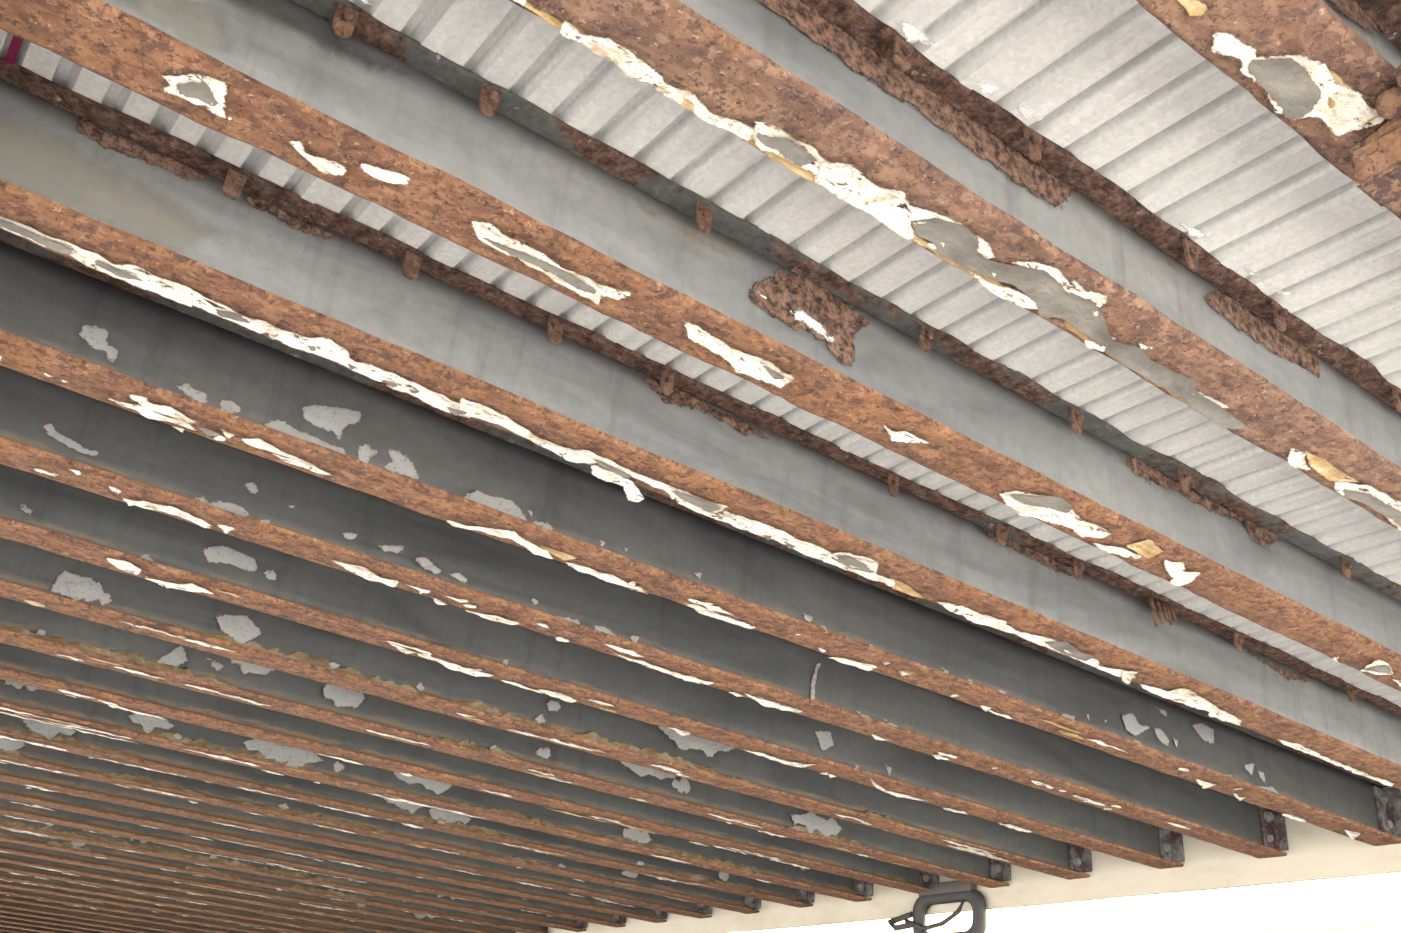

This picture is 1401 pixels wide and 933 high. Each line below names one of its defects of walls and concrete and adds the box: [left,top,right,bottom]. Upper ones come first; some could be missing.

corrosion [76,115,206,181]
peeling [162,73,234,120]
peeling [290,141,410,185]
corrosion [757,0,1071,210]
peeling [1211,32,1385,137]
corrosion [246,194,334,239]
peeling [514,0,1250,429]
corrosion [749,269,870,366]
corrosion [1204,290,1320,378]
corrosion [1126,457,1279,547]
peeling [0,614,836,804]
peeling [0,772,809,933]